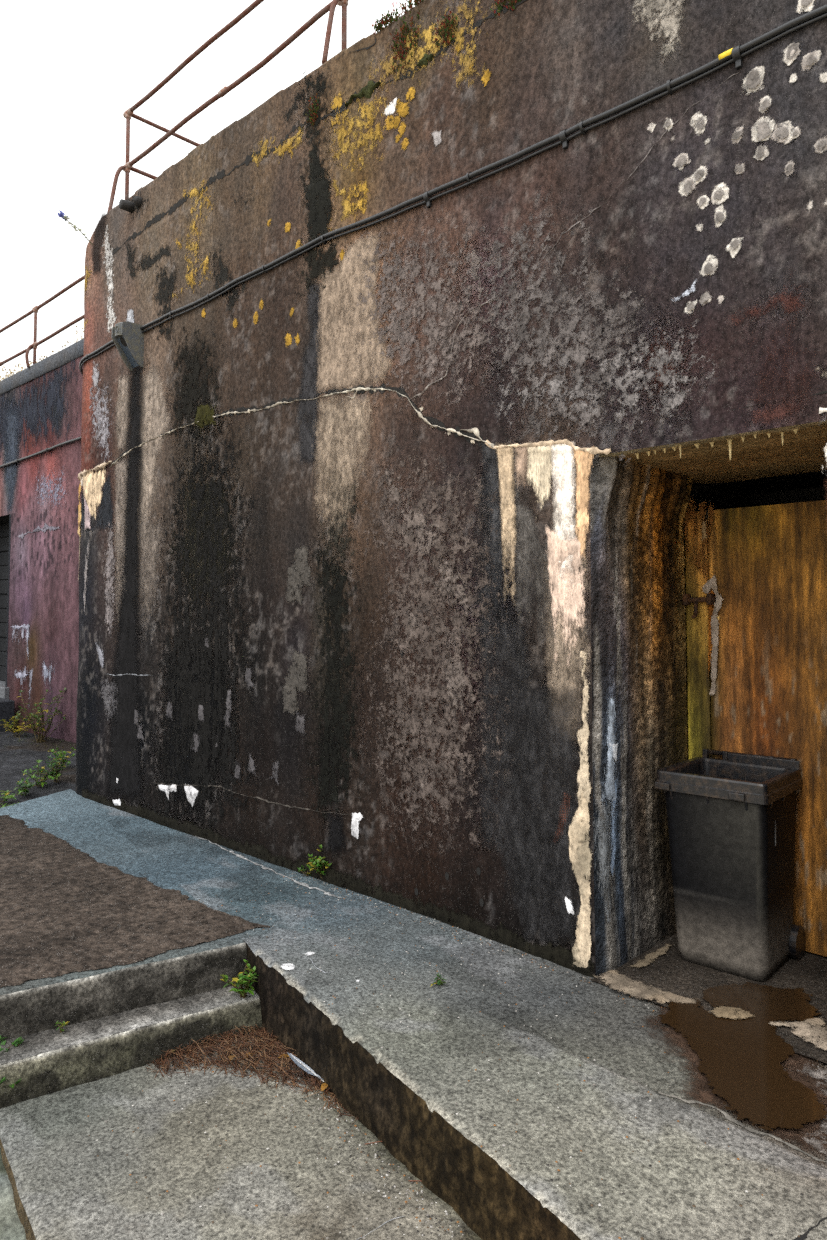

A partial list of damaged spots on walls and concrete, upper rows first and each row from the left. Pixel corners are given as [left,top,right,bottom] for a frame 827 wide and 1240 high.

leakage [77,237,342,898]
leakage [284,65,390,852]
crack [109,72,739,468]
leakage [477,439,827,1159]
crack [658,1092,827,1163]
crack [793,1217,827,1240]